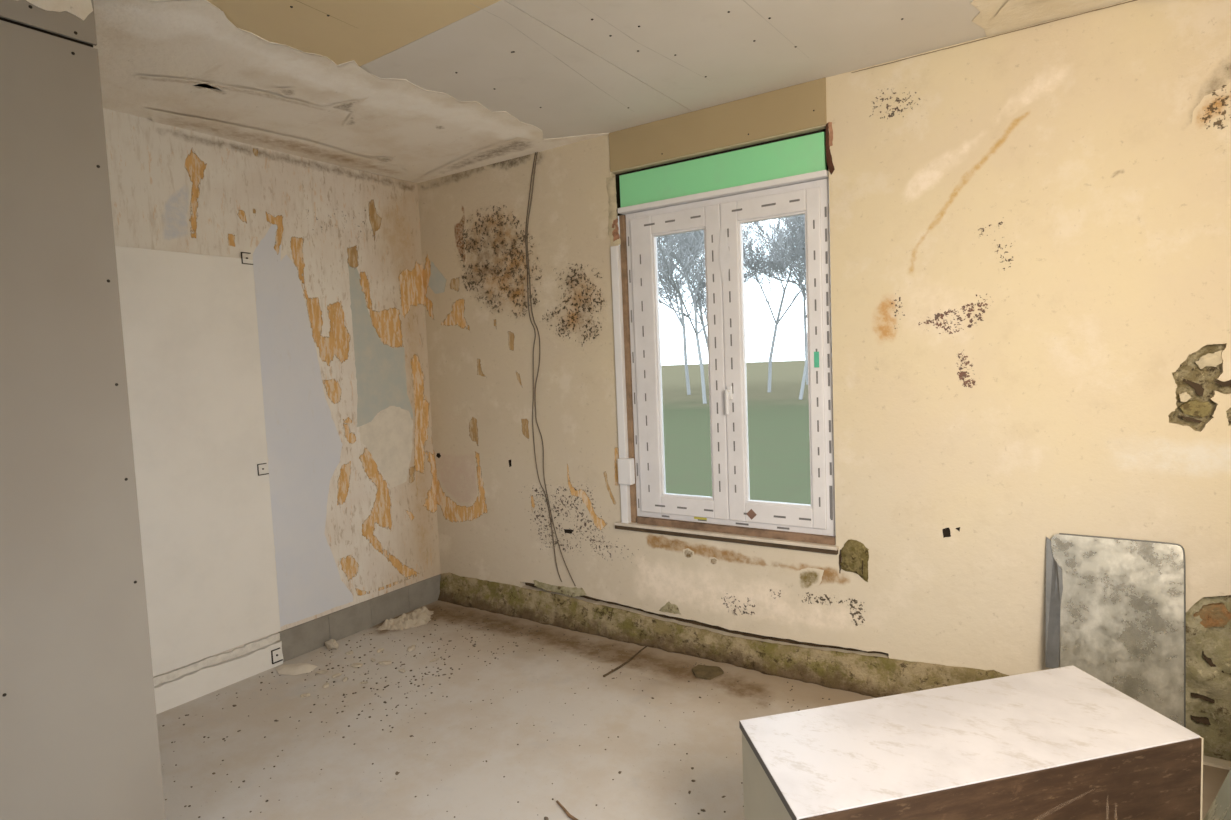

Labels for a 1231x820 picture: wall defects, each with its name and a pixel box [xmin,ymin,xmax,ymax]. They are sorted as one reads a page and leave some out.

leakage [869,89,920,119]
leakage [1165,48,1231,145]
peeling [369,199,382,241]
leakage [884,56,1079,400]
flaking render [253,224,353,627]
leakage [146,108,613,596]
flaking render [348,263,413,488]
rust [867,287,902,351]
spalling [1168,344,1231,431]
leakage [521,447,873,640]
spalling [839,539,869,582]
leakage [359,600,783,716]